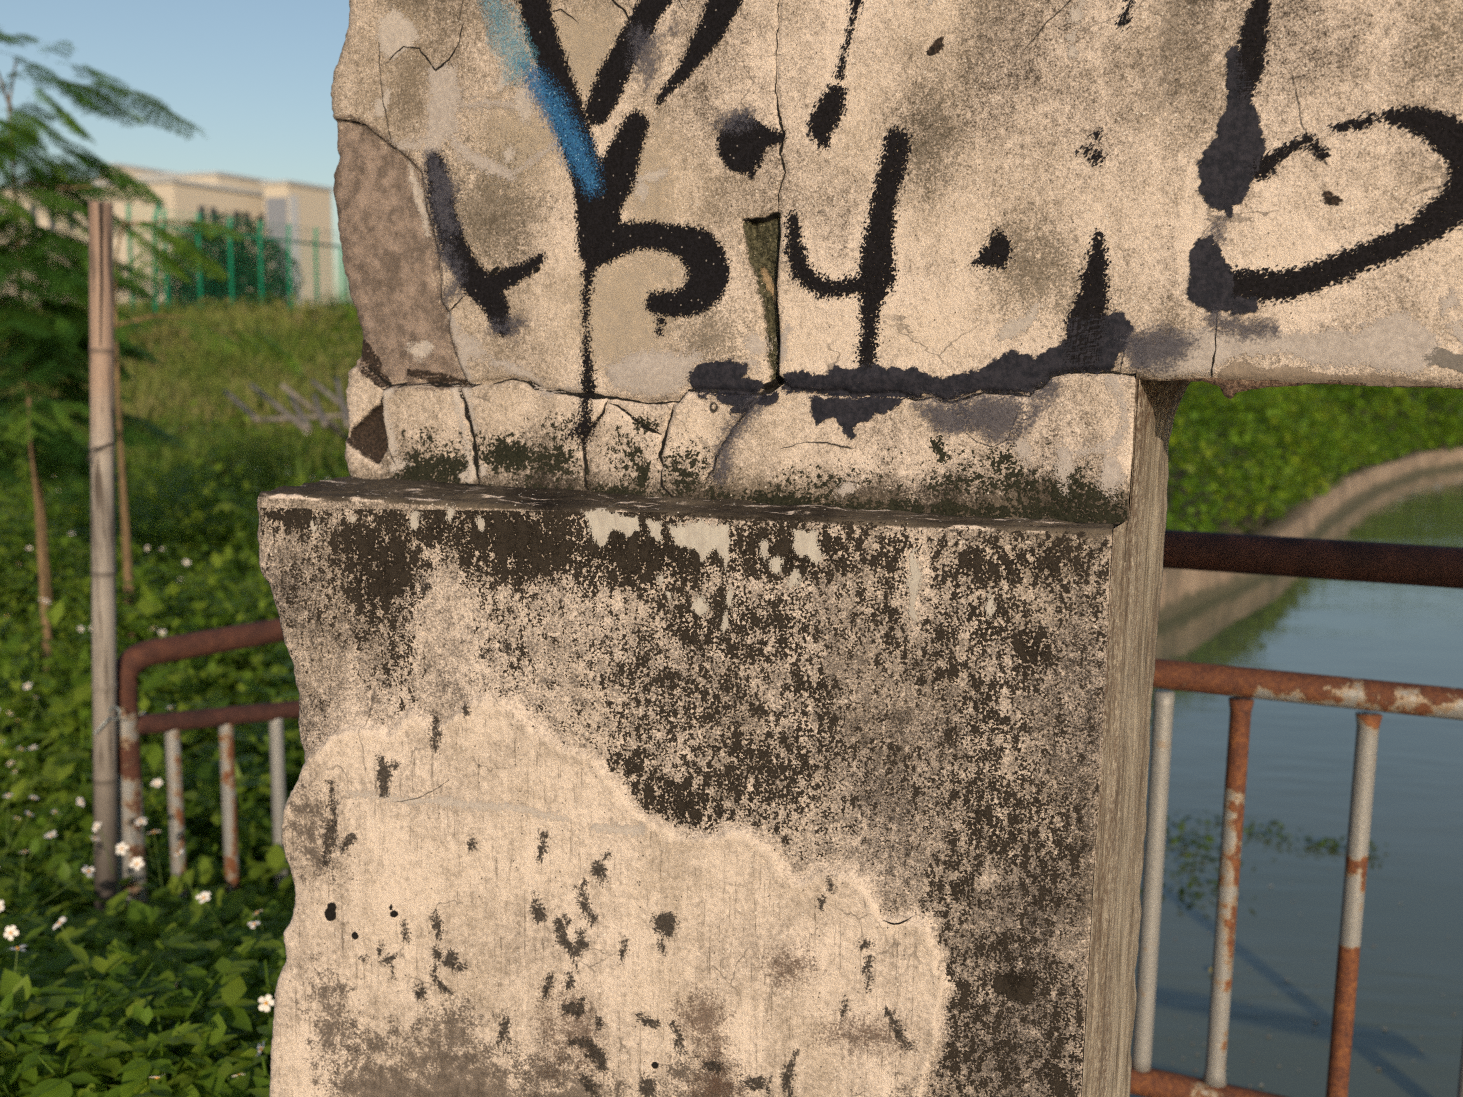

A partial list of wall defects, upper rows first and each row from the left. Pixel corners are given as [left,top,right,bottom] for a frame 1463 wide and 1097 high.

crack [771,0,786,211]
spalling [333,84,584,464]
crack [335,0,779,498]
crack [1210,315,1218,377]
crack [781,441,851,449]
crack [906,353,1137,447]
peeling [374,753,399,798]
damp [260,508,1112,1097]
spalling [325,902,337,921]
peeling [352,904,468,1005]
peeling [529,852,612,1097]
peeling [700,1049,800,1097]